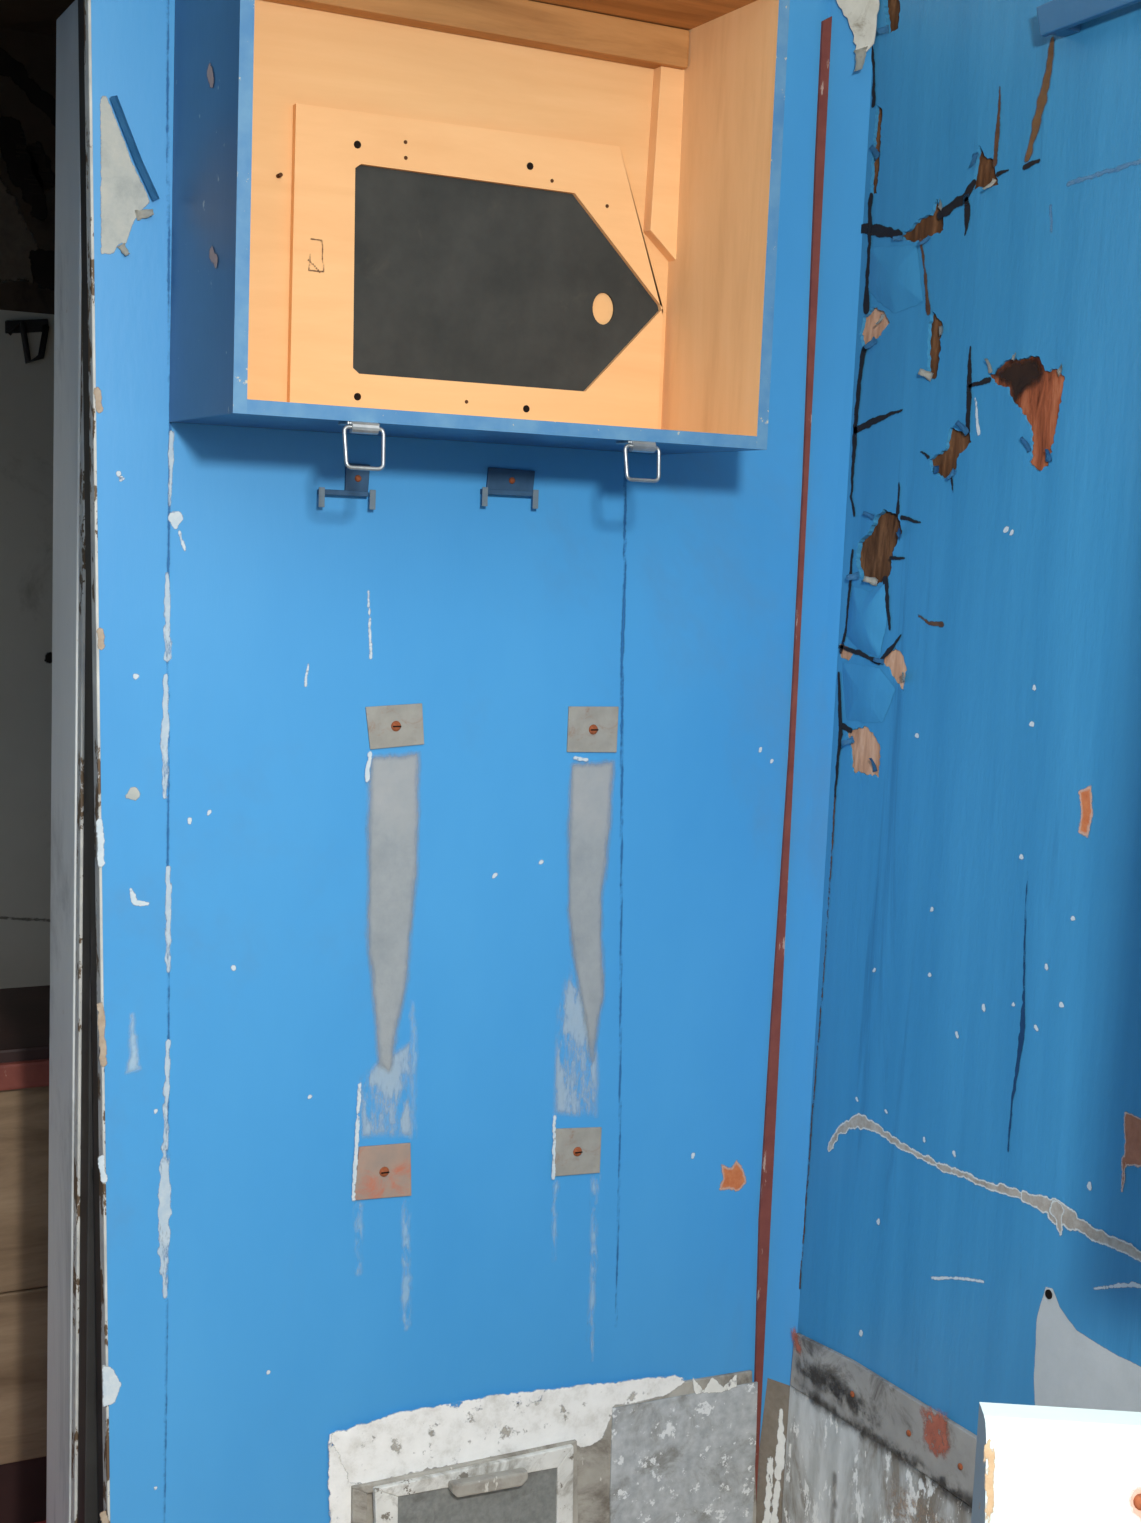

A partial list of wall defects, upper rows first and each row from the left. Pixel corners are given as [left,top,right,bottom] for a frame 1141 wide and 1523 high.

crack [869,45,877,108]
crack [799,87,1009,1289]
crack [1008,886,1027,1152]
rust [719,1160,746,1192]
peeling [693,1374,737,1394]